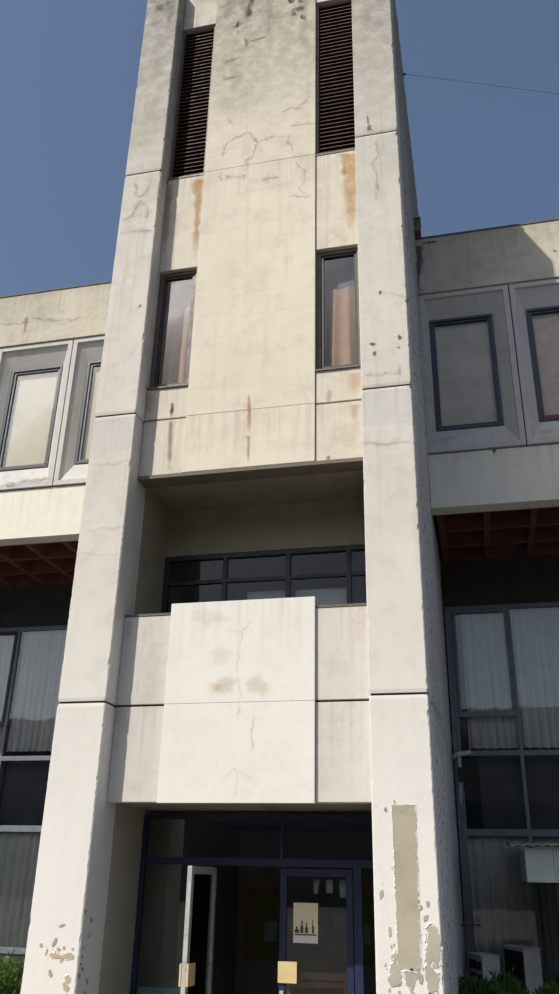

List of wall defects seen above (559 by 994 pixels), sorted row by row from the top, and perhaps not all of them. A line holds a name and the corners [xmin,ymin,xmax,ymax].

peeling [39,909,93,994]
peeling [379,800,443,994]